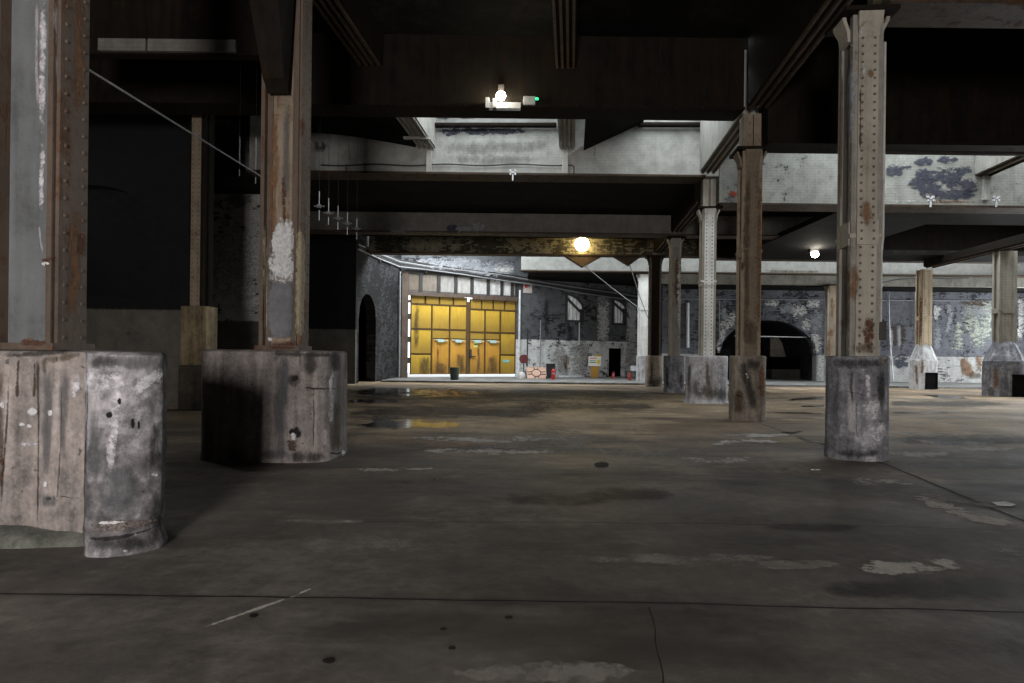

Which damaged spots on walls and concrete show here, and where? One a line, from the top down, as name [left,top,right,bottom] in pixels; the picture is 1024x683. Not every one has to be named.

peeling [214,119,250,170]
peeling [887,155,980,201]
peeling [213,194,306,350]
rust [856,318,875,351]
peeling [933,299,992,350]